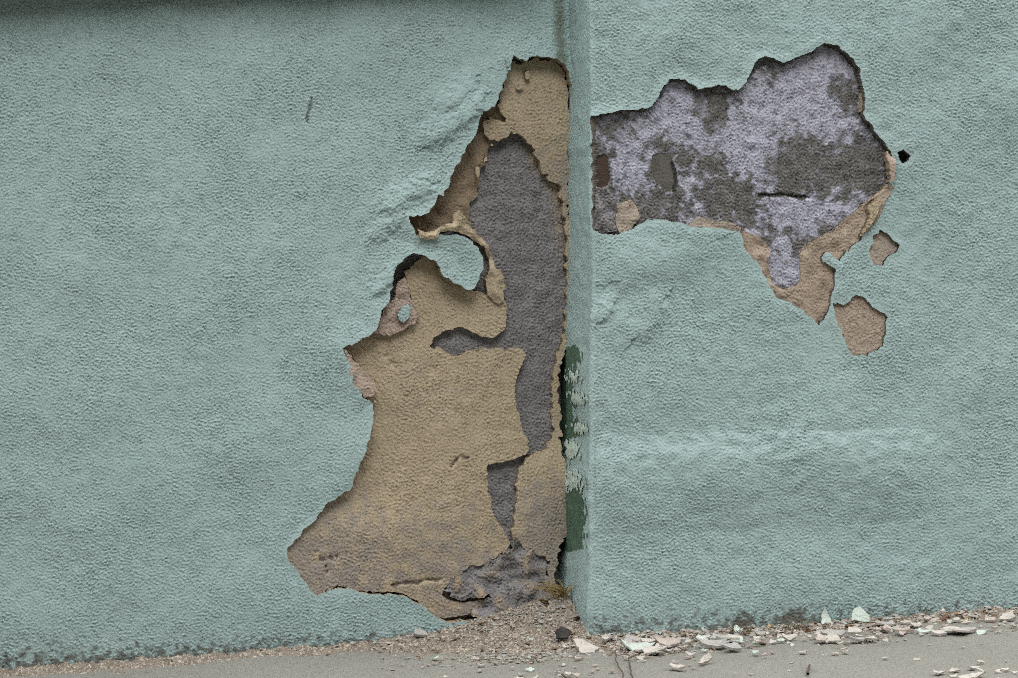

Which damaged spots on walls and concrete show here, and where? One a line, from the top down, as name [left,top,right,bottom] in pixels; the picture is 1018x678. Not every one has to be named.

flaking render [287,57,589,621]
flaking render [594,44,906,356]